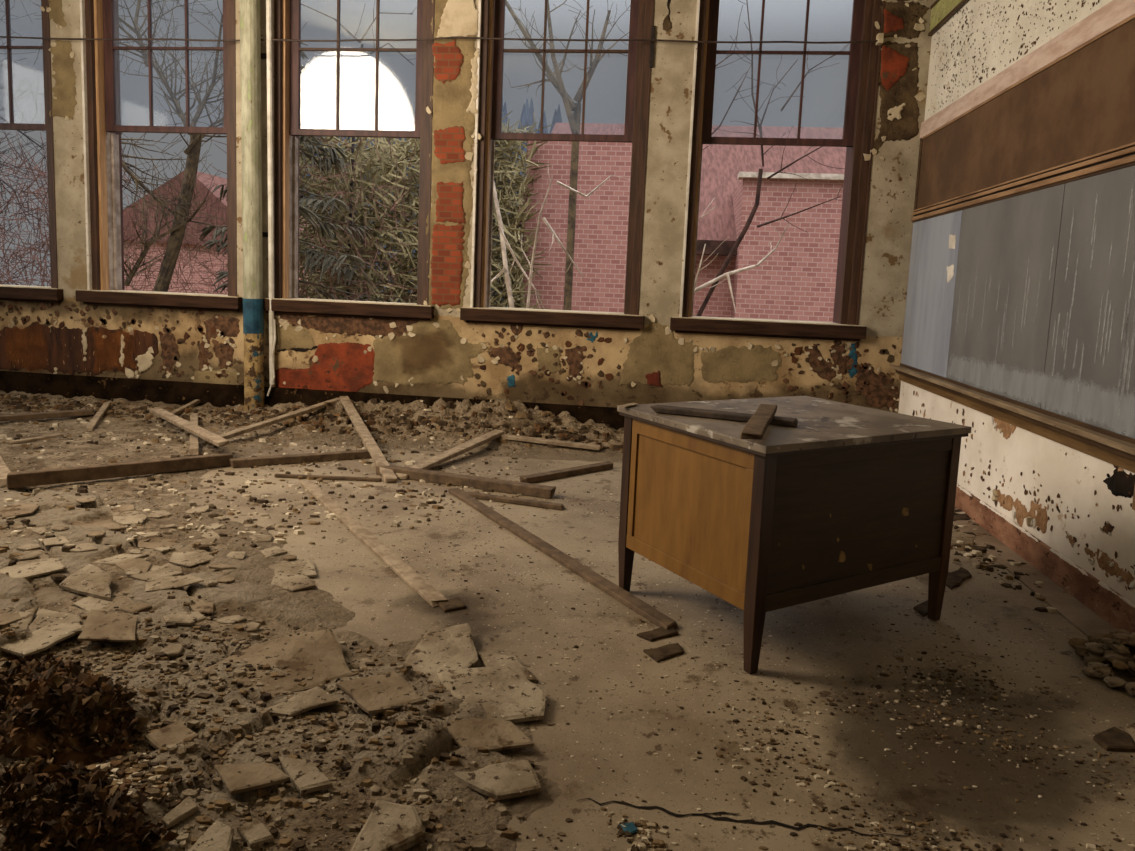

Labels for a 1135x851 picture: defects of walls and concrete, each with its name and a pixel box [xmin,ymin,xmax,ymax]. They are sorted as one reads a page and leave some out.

spalling [863,0,1099,161]
flaking render [265,0,931,419]
peeling [0,301,240,385]
peeling [952,409,1016,448]
peeling [957,460,1135,608]
crack [576,798,911,836]